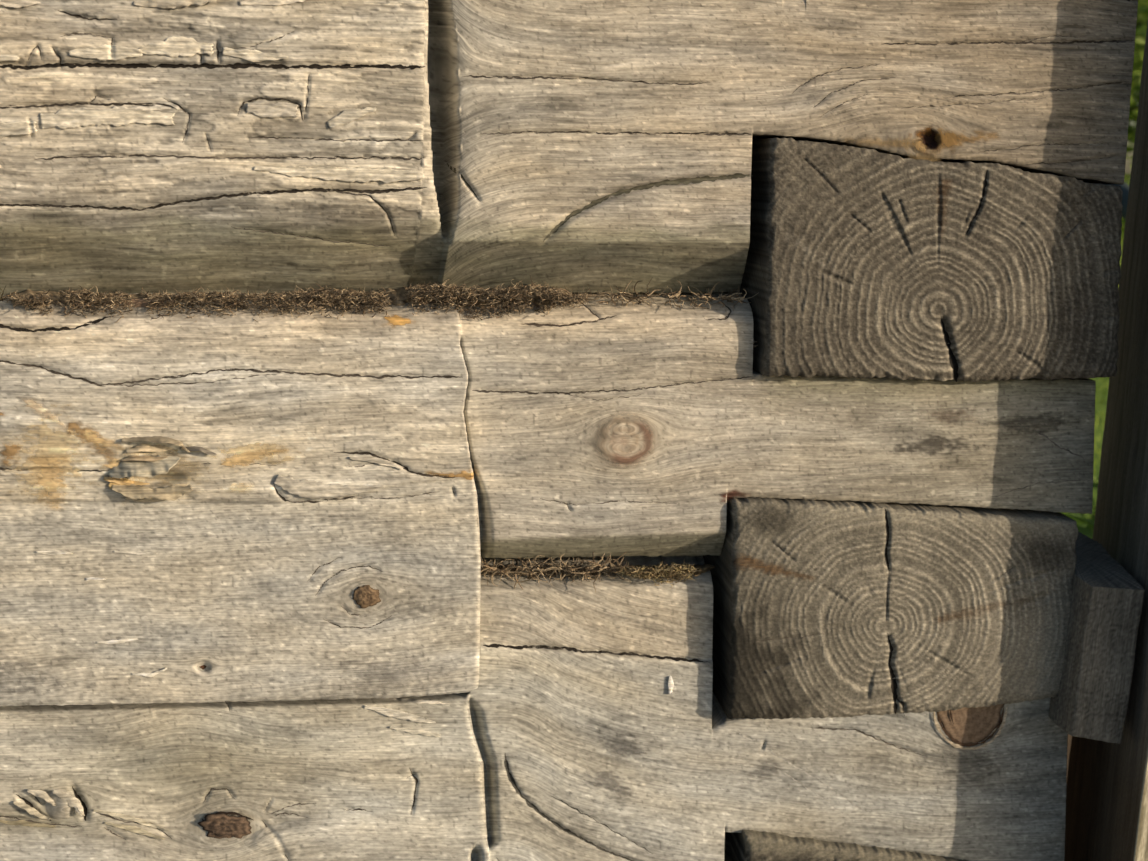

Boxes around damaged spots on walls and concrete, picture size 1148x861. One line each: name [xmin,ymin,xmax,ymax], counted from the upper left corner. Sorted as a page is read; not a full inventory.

crack [0,10,481,202]
crack [0,187,427,246]
crack [0,316,111,332]
crack [522,303,617,327]
crack [706,303,732,320]
crack [941,317,959,382]
crack [0,360,752,401]
peeling [103,436,217,502]
crack [885,509,905,716]
crack [483,643,704,662]
crack [811,727,926,756]